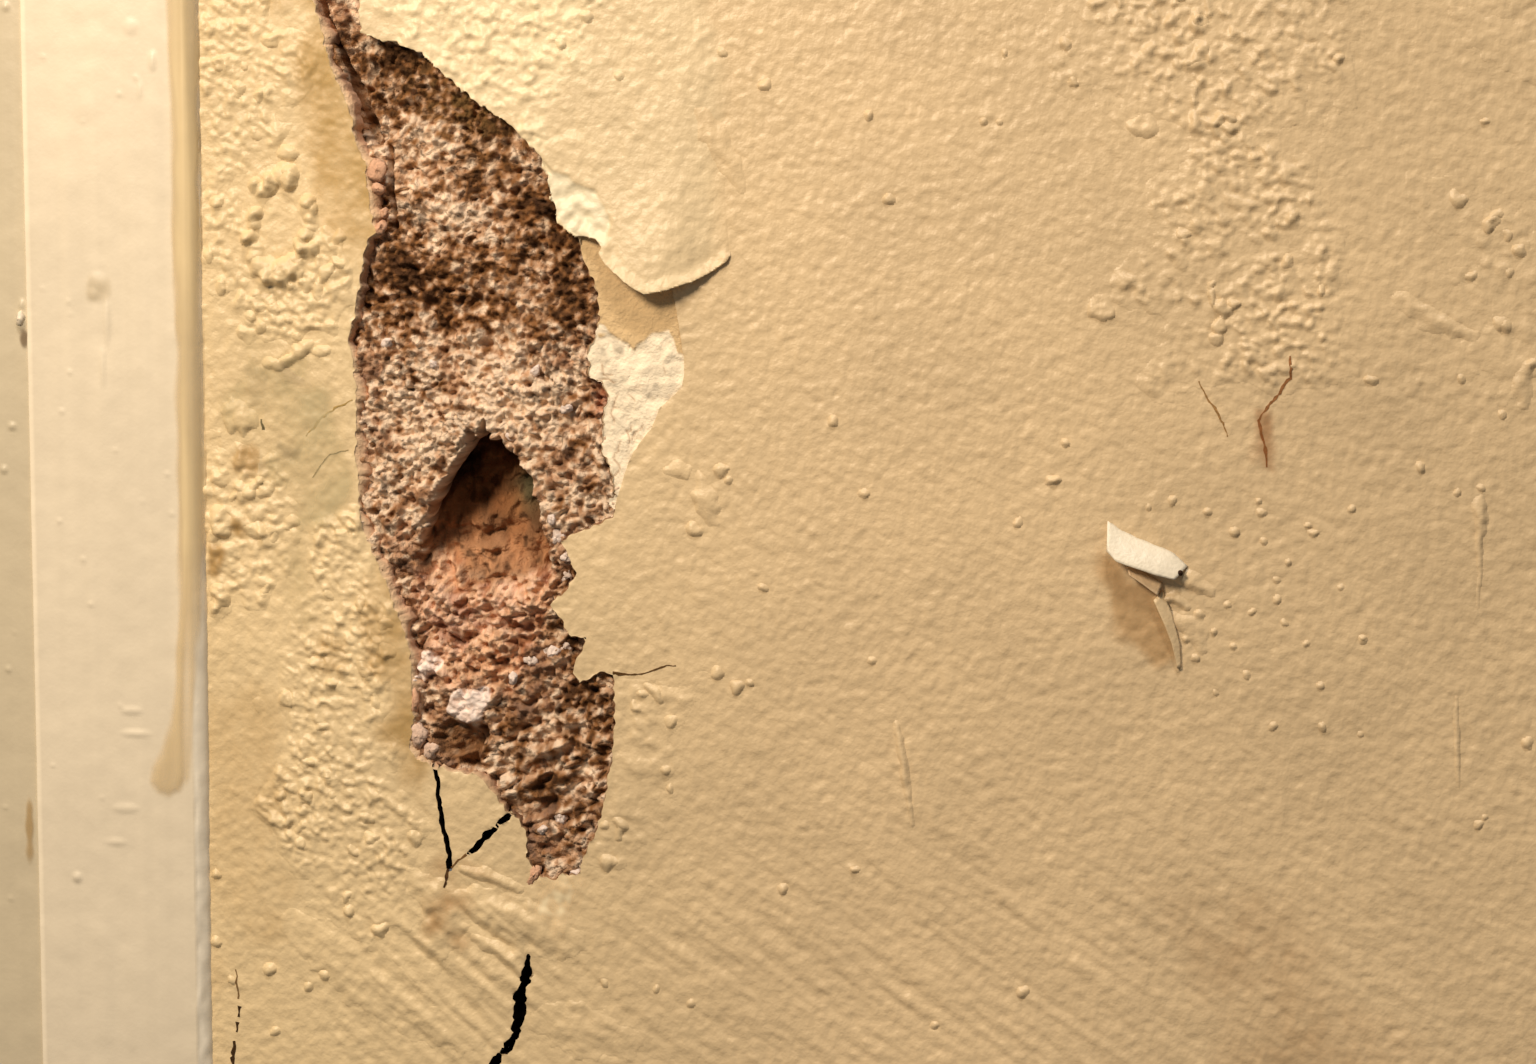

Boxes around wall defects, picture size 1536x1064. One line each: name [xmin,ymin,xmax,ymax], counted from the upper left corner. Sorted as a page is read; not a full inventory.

spalling [313,0,732,885]
peeling [1107,521,1232,673]
crack [432,763,511,888]
crack [489,954,532,1064]